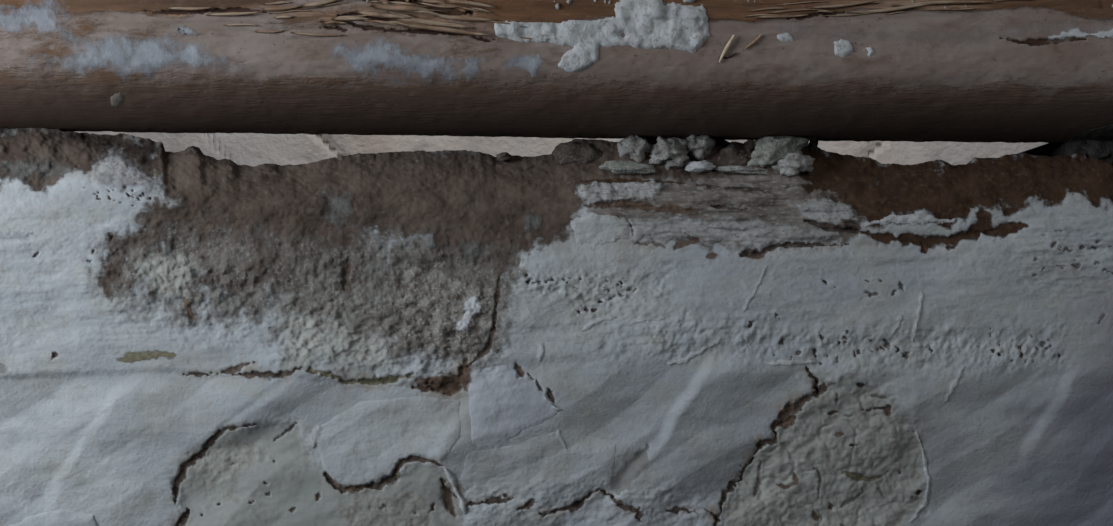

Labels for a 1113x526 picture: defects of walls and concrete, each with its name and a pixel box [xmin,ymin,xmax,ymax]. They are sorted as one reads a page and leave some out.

flaking render [0,128,1113,371]
flaking render [180,424,462,526]
crack [183,358,469,396]
flaking render [515,364,560,410]
flaking render [723,330,923,526]